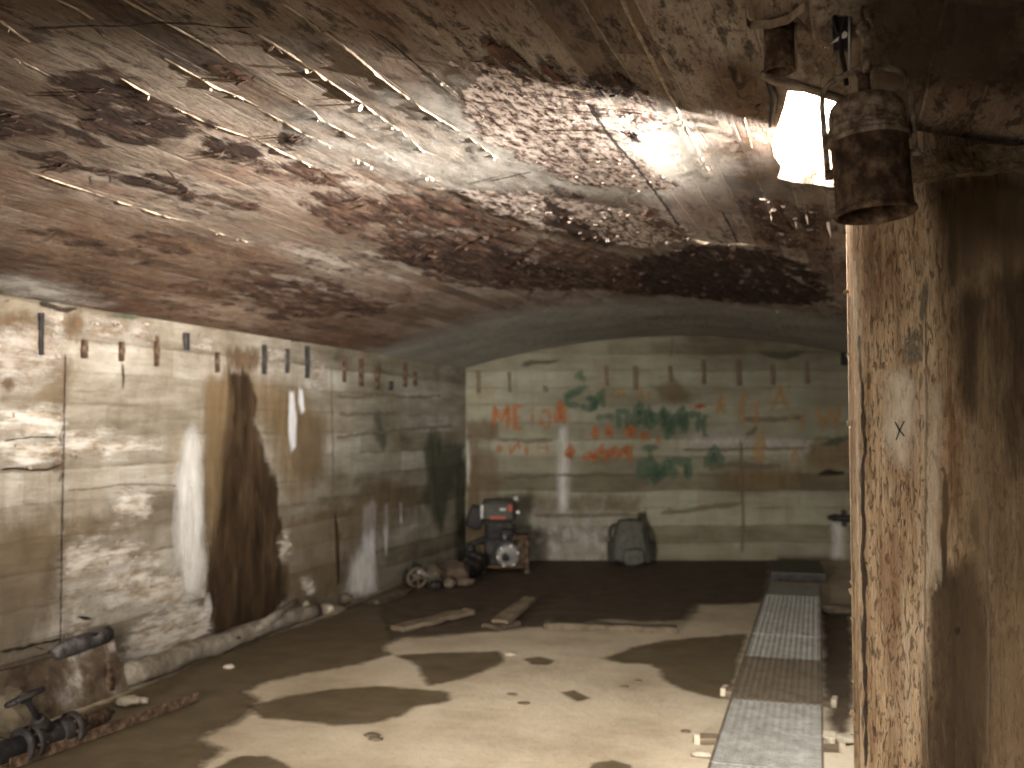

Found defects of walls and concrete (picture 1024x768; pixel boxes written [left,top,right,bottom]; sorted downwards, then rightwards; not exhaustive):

crack [28,21,252,42]
crack [60,160,83,173]
spalling [0,28,858,339]
damp [177,370,319,634]
damp [17,431,770,768]